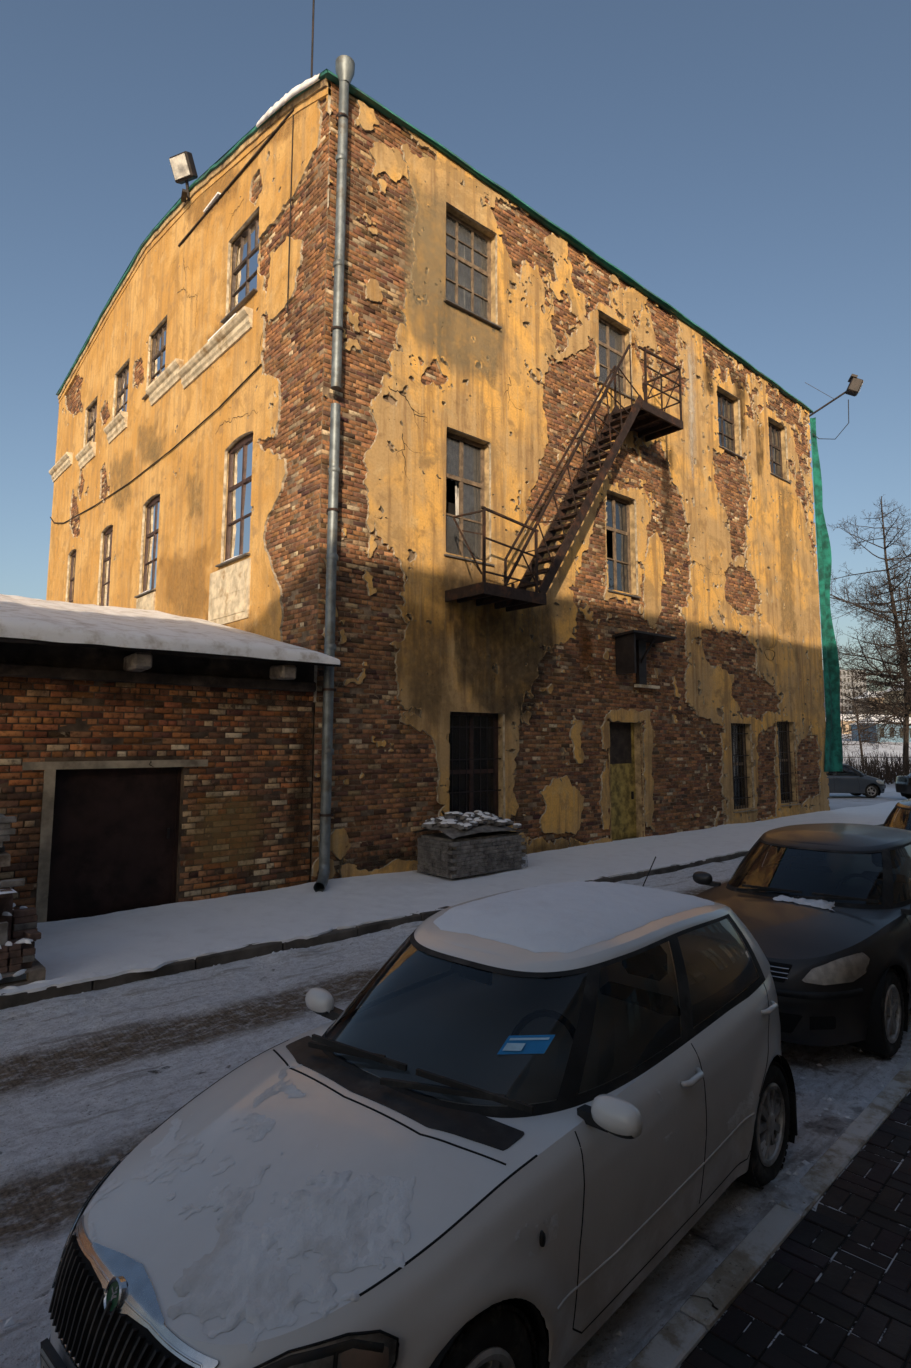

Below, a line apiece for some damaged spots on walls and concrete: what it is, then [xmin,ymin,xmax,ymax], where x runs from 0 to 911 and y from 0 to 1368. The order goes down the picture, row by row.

flaking render [251,172,262,204]
flaking render [66,375,83,415]
flaking render [101,403,115,425]
flaking render [134,358,150,387]
flaking render [410,358,451,389]
flaking render [485,198,815,556]
flaking render [101,465,110,503]
flaking render [259,82,444,882]
flaking render [71,472,85,537]
flaking render [510,441,780,847]
flaking render [794,731,821,806]